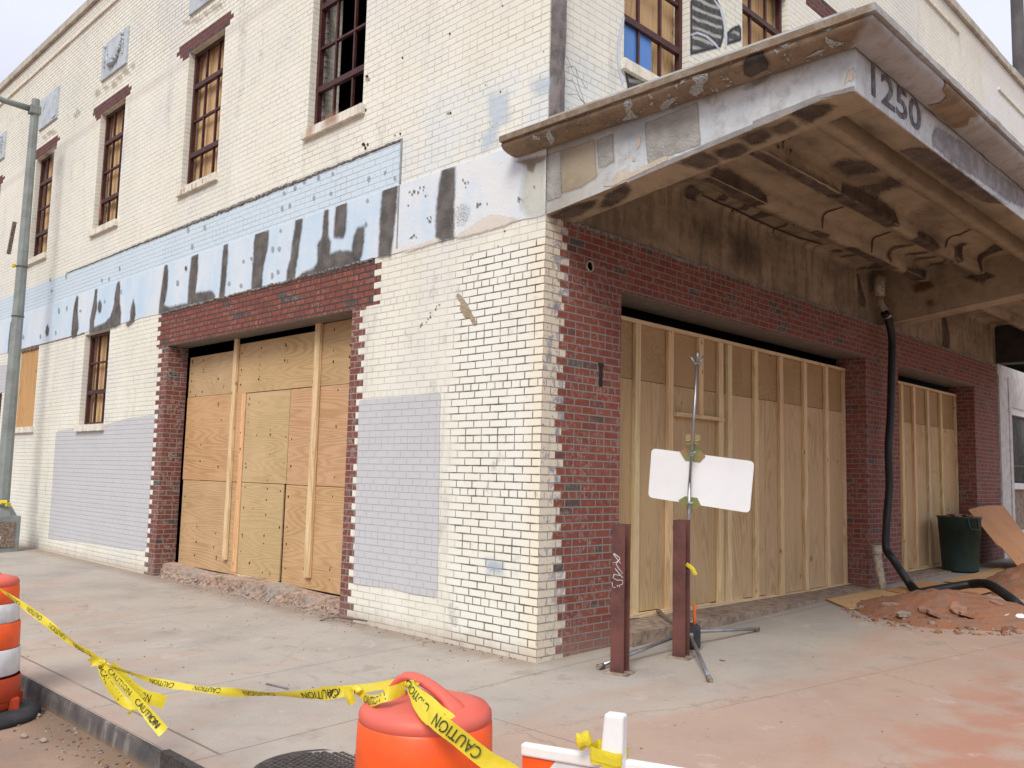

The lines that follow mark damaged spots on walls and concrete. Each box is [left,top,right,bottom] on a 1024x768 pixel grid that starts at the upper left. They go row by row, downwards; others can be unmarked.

peeling [806,26,844,58]
peeling [928,80,980,128]
peeling [533,69,855,193]